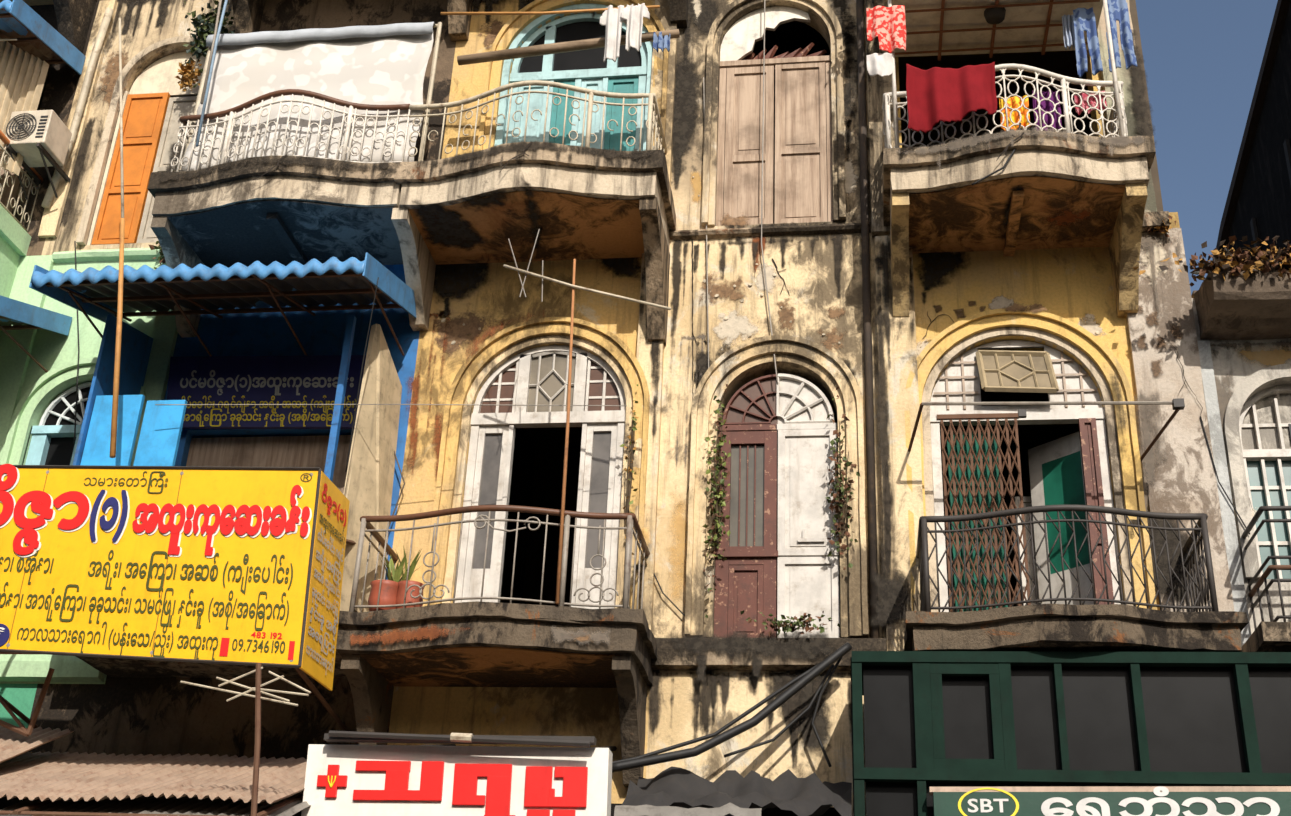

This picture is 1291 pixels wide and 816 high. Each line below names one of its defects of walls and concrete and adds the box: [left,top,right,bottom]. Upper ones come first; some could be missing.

water stain [472,0,535,23]
water stain [523,183,543,248]
water stain [412,191,506,386]
water stain [600,222,847,435]
peeling [699,263,795,344]
flaking render [989,296,1049,313]
peeling [1078,314,1106,336]
water stain [648,670,674,734]
water stain [670,631,852,767]